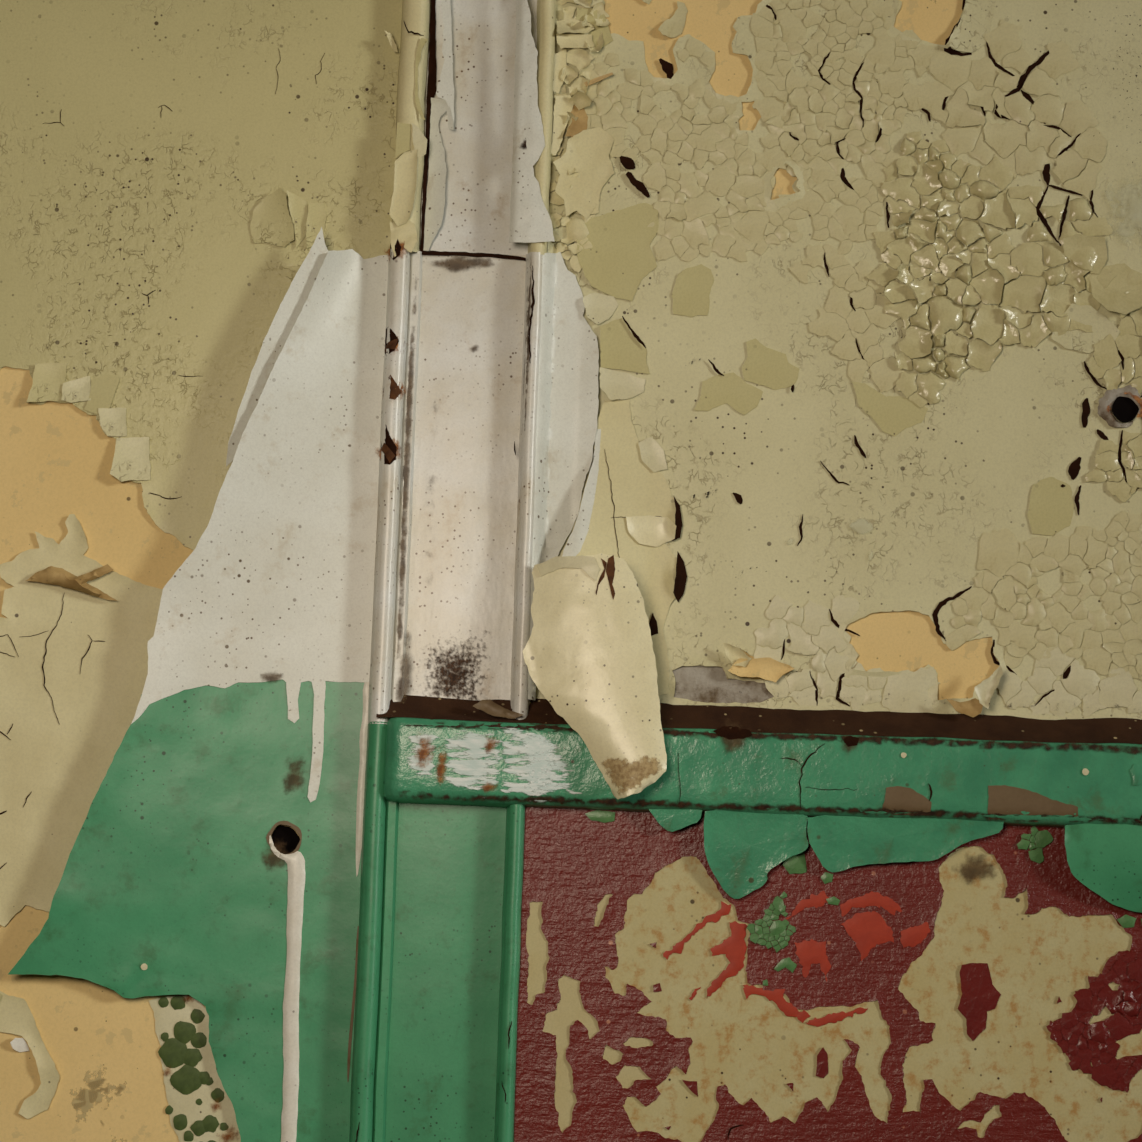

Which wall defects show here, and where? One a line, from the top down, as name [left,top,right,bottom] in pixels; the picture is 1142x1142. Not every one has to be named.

crack [620,156,650,198]
crack [818,52,882,190]
crack [944,0,1098,246]
peeling [509,0,1142,799]
crack [1081,350,1127,483]
crack [1061,457,1081,515]
peeling [0,0,454,1142]
crack [932,586,972,641]
crack [810,668,852,707]
peeling [526,902,600,1133]
peeling [594,894,613,927]
peeling [603,785,1142,1142]